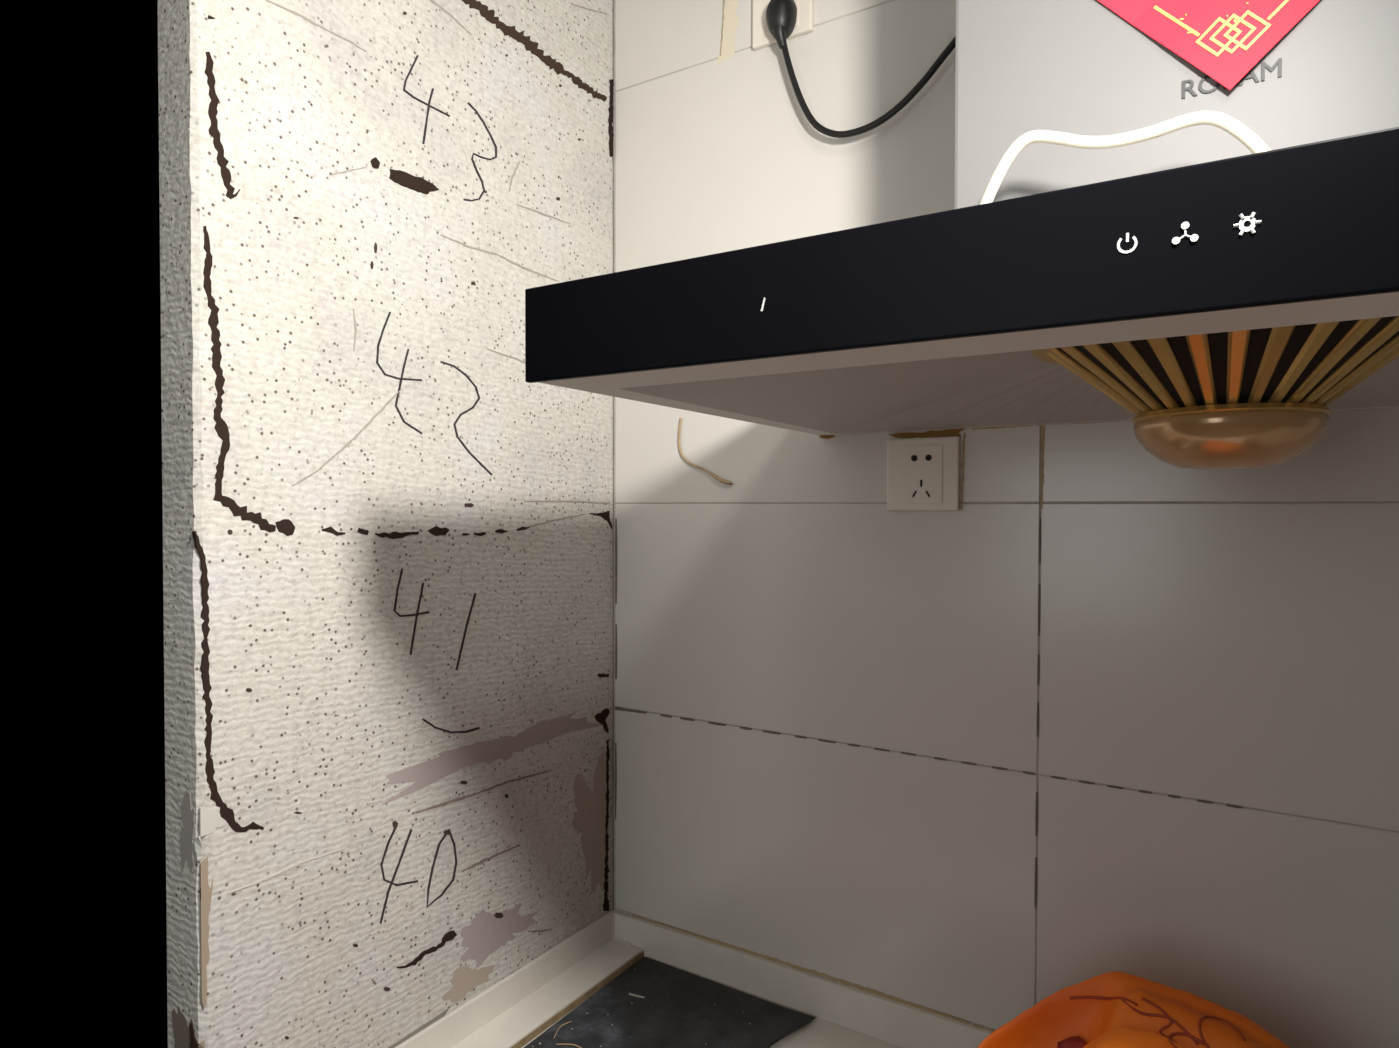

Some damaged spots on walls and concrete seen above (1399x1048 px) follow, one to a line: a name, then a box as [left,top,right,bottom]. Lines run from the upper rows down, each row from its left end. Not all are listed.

crack [430,0,614,157]
crack [204,52,241,199]
crack [441,234,558,281]
crack [351,309,359,351]
crack [203,226,276,532]
crack [487,349,525,363]
crack [292,388,402,486]
crack [322,527,419,539]
crack [192,531,264,832]
crack [397,930,457,968]
spalling [171,1005,195,1048]